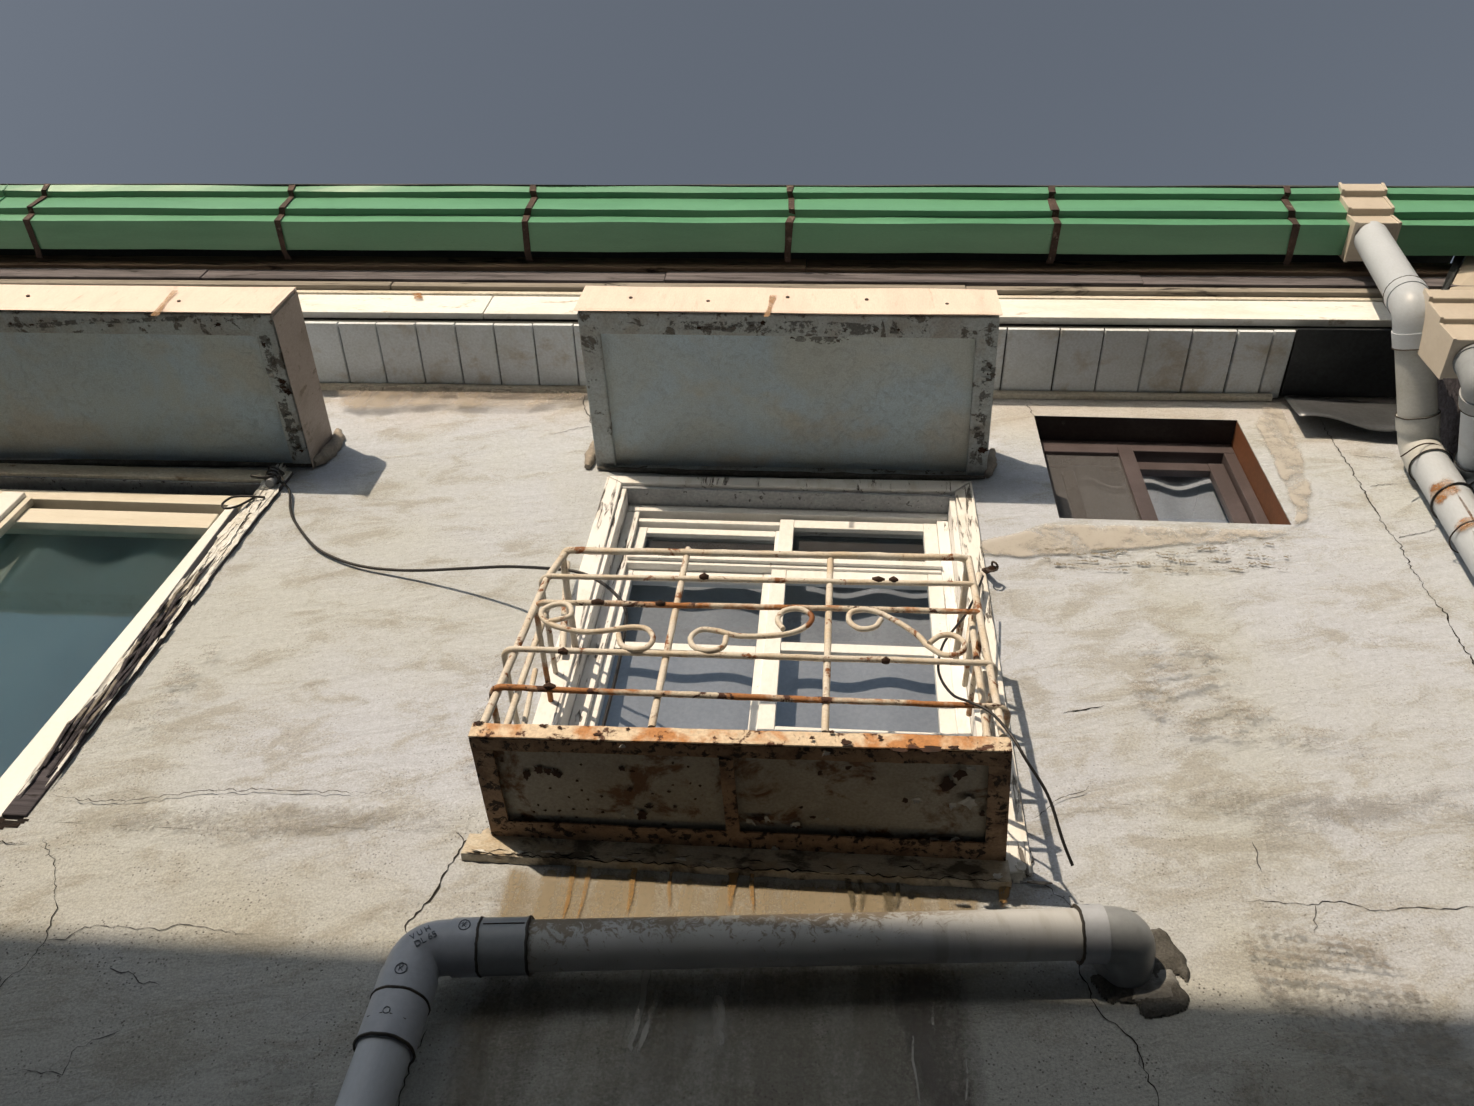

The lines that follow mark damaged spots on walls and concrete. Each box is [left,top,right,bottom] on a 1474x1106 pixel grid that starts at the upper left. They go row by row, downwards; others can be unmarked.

peeling [8,316,191,331]
peeling [670,321,926,344]
peeling [259,335,304,455]
peeling [970,364,996,465]
crack [1323,424,1474,664]
crack [0,841,252,987]
crack [404,833,1072,933]
water stain [501,869,976,919]
crack [1245,842,1471,935]
crack [0,1031,118,1085]
water stain [683,964,972,1106]
crack [1079,965,1159,1106]